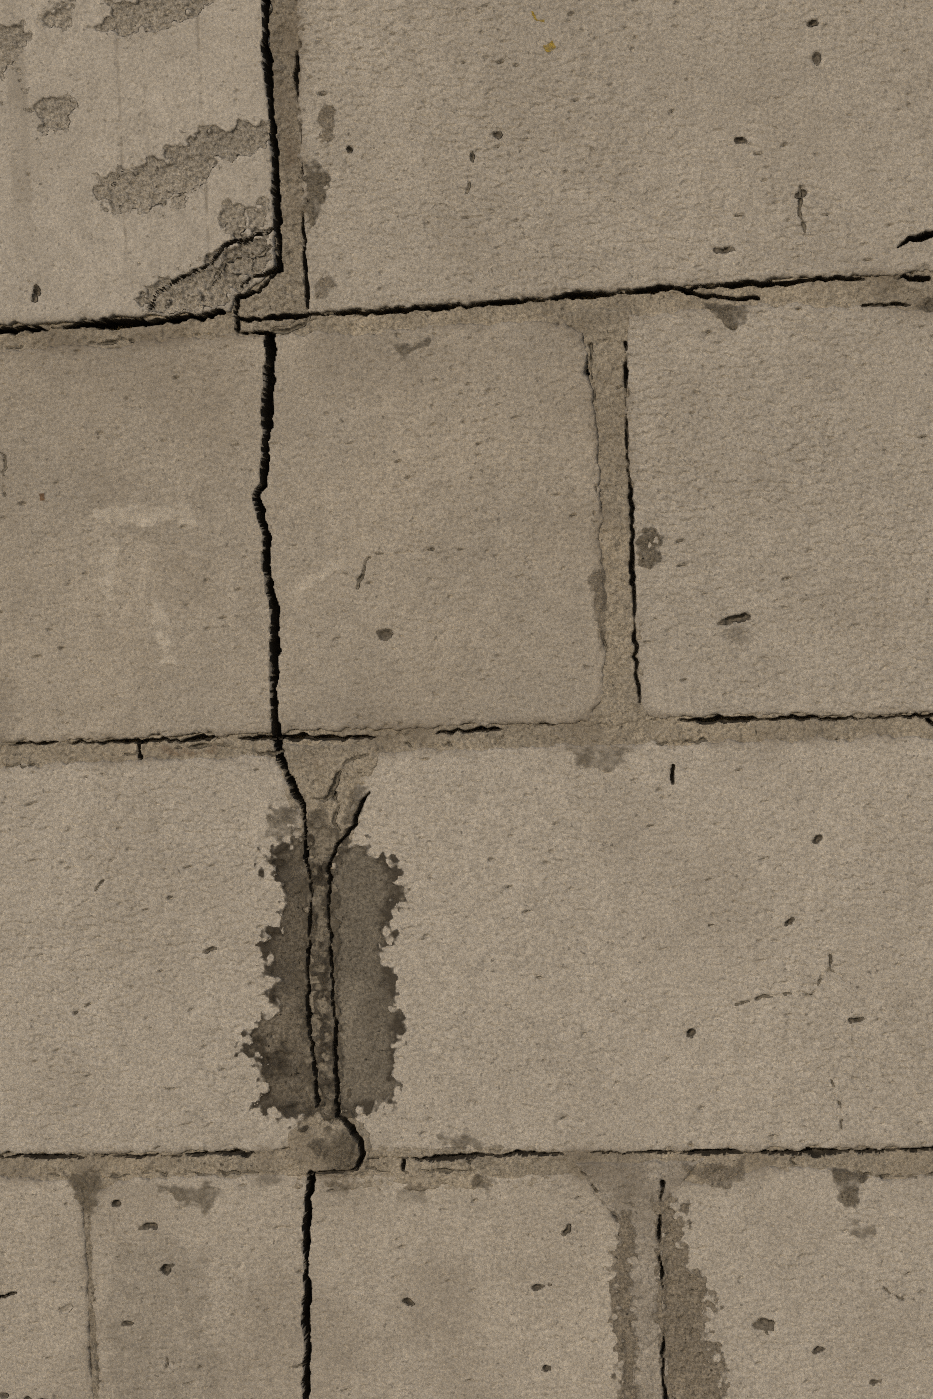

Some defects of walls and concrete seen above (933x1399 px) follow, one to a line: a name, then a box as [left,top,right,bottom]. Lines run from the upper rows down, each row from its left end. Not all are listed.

spalling [0,0,79,141]
spalling [94,0,216,41]
spalling [91,114,279,219]
crack [90,337,134,345]
crack [0,309,226,335]
spalling [134,197,277,319]
crack [861,274,931,307]
crack [897,231,933,248]
crack [9,734,224,760]
crack [149,0,865,1399]
damp [234,816,411,1132]
crack [581,1080,933,1193]